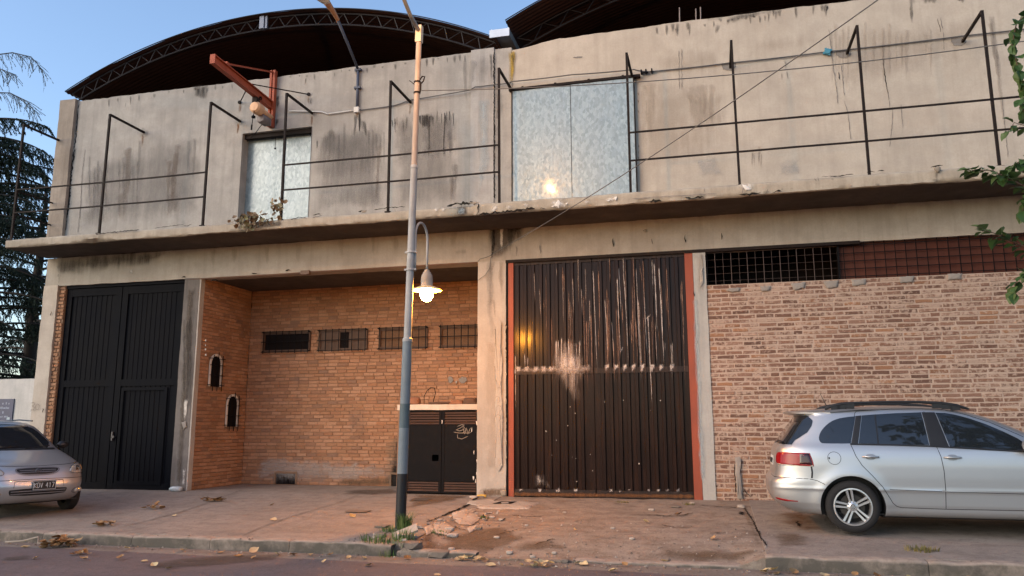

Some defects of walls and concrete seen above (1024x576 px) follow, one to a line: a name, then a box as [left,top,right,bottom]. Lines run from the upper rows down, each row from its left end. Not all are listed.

damp [419,112,454,156]